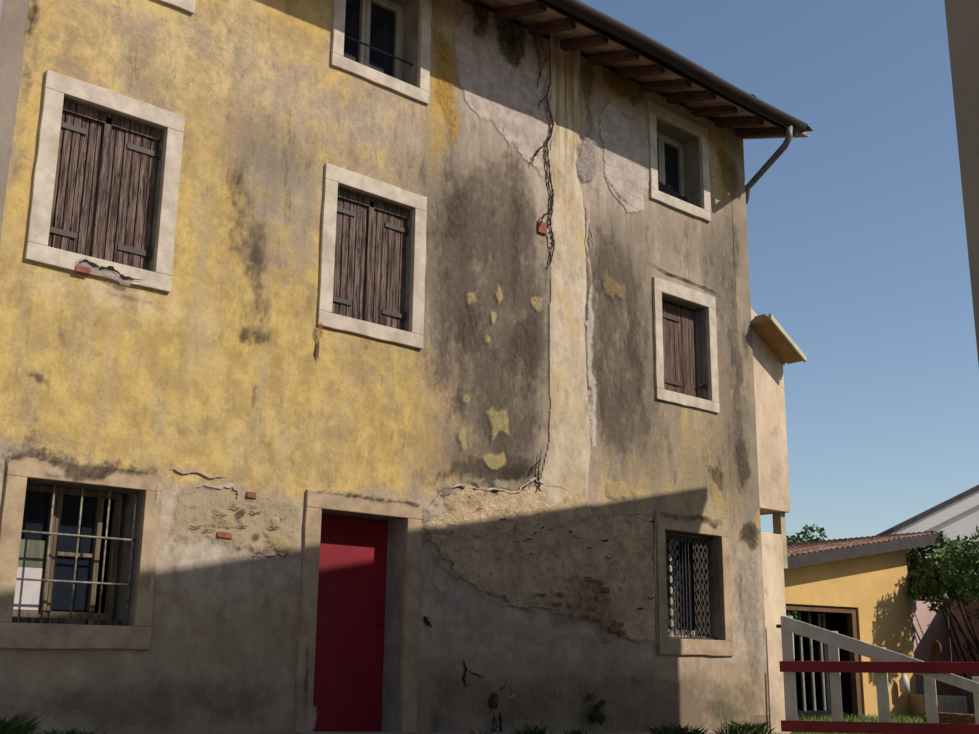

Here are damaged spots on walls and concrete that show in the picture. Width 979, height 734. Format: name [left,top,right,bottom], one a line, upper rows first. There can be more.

peeling [453,13,547,177]
crack [532,34,556,287]
peeling [576,104,650,213]
leakage [436,156,543,487]
crack [585,200,593,280]
leakage [585,236,644,449]
crack [651,263,720,297]
peeling [487,409,508,439]
crack [529,452,541,492]
leakage [737,413,751,480]
spalling [422,452,659,643]